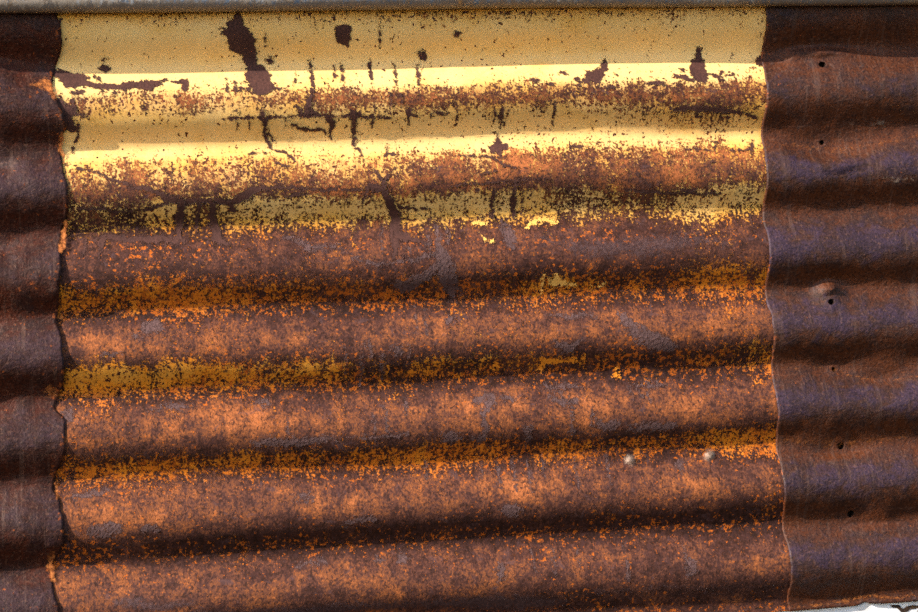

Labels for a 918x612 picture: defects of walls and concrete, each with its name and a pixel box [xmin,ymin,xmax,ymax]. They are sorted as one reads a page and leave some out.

peeling [220,12,296,96]
peeling [334,24,352,48]
peeling [415,49,427,85]
corrosion [351,2,640,31]
peeling [529,58,618,90]
peeling [673,46,735,84]
peeling [53,57,189,154]
peeling [487,106,510,156]
peeling [248,149,296,168]
peeling [354,143,462,302]
peeling [471,183,559,250]
corrosion [35,63,791,612]